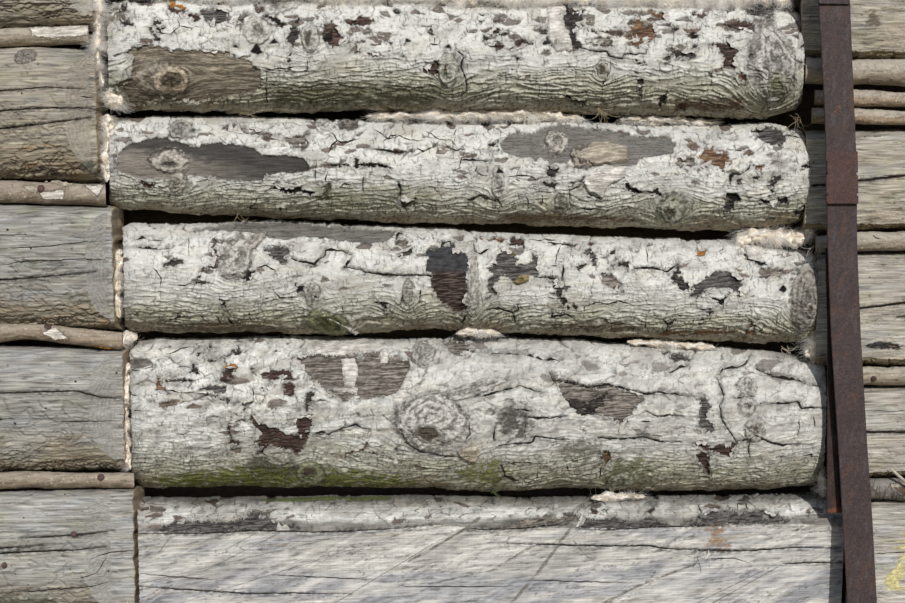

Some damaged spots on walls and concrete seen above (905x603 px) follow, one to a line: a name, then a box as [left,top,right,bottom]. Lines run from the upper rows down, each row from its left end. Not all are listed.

peeling [116,17,262,106]
peeling [483,5,679,61]
peeling [114,123,332,200]
peeling [488,123,741,217]
peeling [191,221,412,286]
peeling [425,239,471,314]
peeling [480,236,541,300]
peeling [671,264,745,325]
crack [860,302,905,317]
peeling [155,310,412,455]
crack [402,582,504,590]
crack [534,577,632,585]